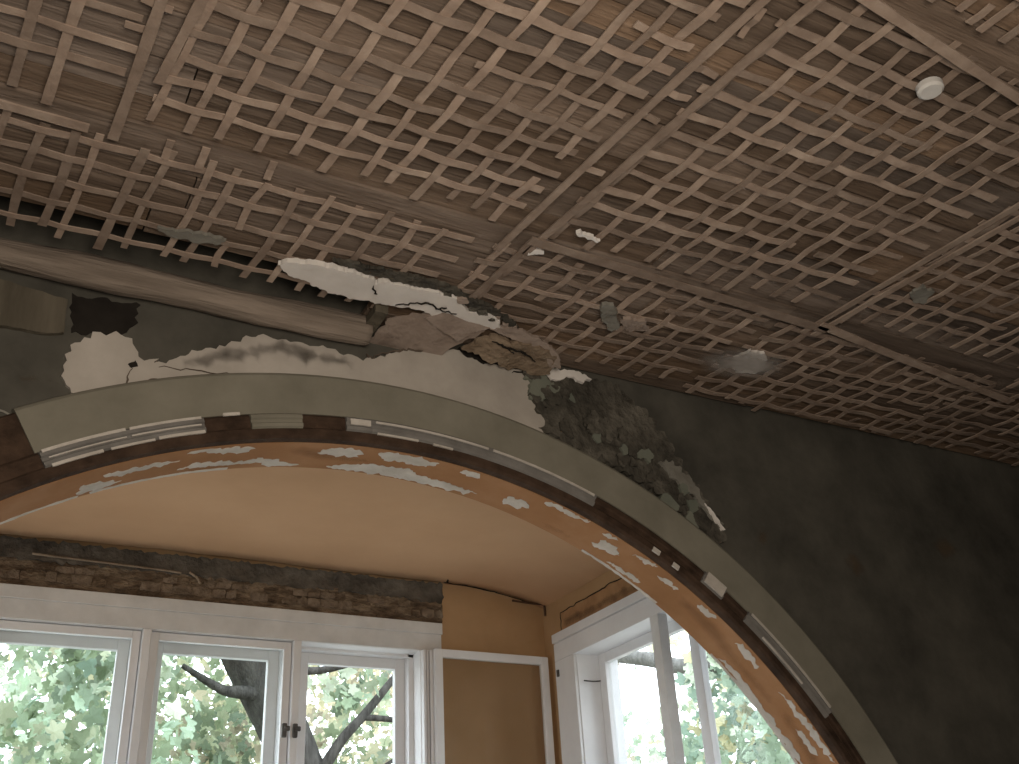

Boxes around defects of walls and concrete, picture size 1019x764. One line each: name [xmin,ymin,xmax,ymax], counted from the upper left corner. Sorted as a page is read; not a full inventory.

crack [372,285,457,315]
spalling [332,257,519,329]
spalling [457,347,498,365]
spalling [41,416,206,467]
peeling [318,448,476,495]
spalling [350,418,595,496]
spalling [513,368,728,545]
spalling [0,446,444,623]
peeling [581,533,657,603]
peeling [632,547,679,590]
spalling [704,572,727,597]
peeling [709,653,834,764]